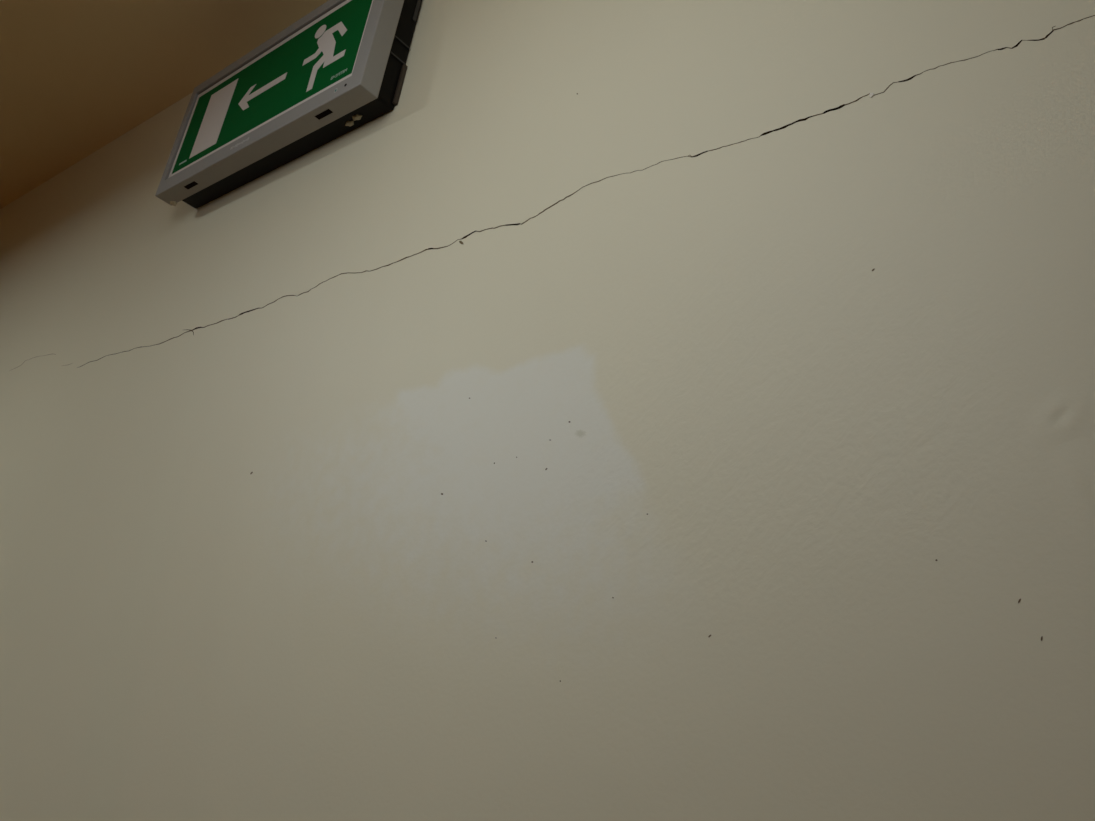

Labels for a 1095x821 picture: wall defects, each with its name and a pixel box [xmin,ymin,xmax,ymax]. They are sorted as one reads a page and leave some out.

crack [14,15,1095,369]